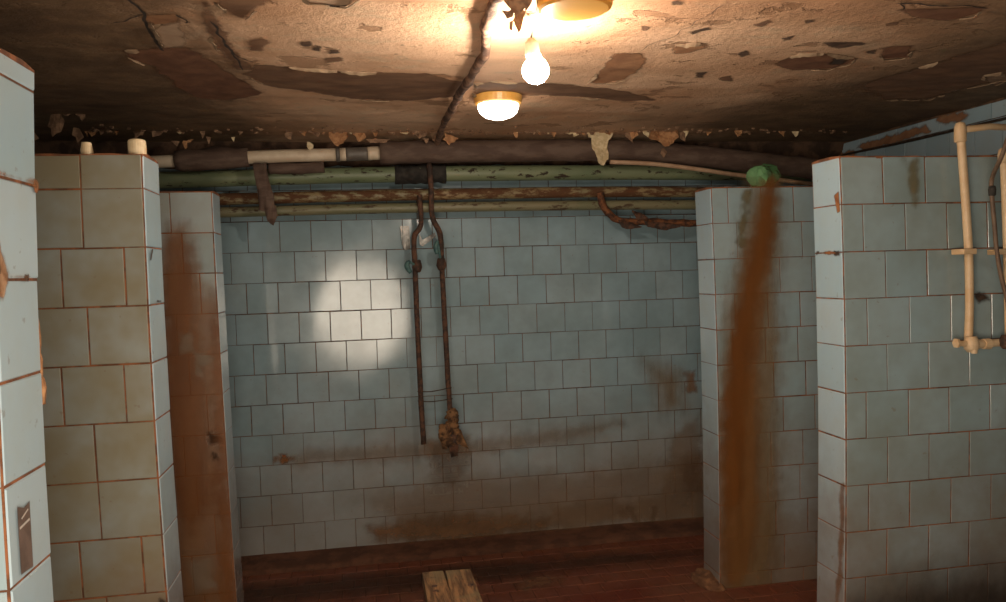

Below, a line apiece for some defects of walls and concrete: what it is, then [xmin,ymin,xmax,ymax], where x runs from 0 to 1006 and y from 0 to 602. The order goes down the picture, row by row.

peeling [124,0,655,102]
peeling [673,28,711,54]
peeling [776,42,915,71]
peeling [48,114,85,142]
peeling [329,132,390,146]
peeling [416,132,458,145]
peeling [572,133,613,166]
peeling [648,131,685,158]
peeling [840,112,968,156]
rust [722,190,777,588]
rust [164,234,233,602]
water stain [373,515,549,541]